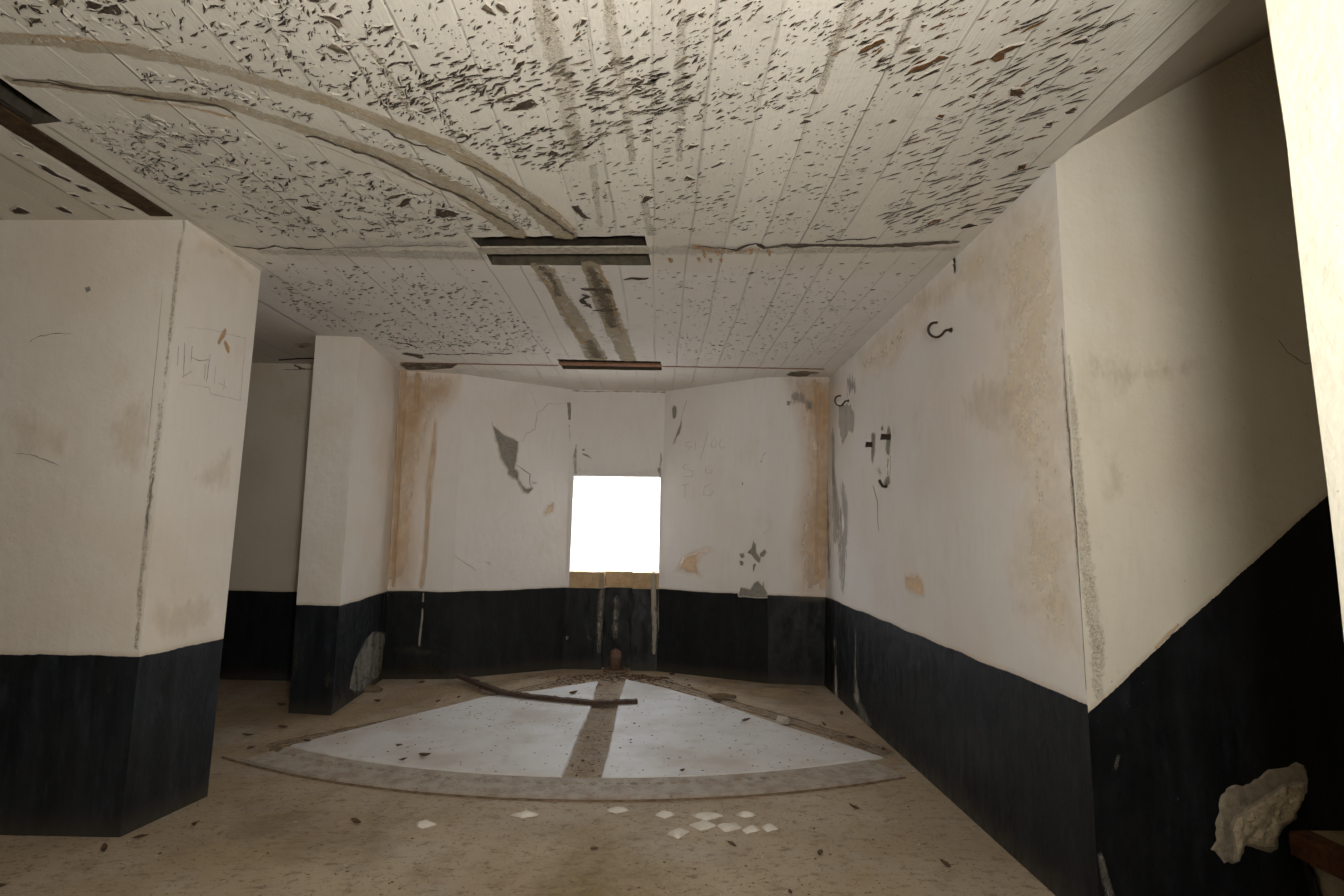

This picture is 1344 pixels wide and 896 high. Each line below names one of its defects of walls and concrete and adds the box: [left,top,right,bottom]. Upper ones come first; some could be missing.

peeling [1,0,1135,240]
peeling [267,262,550,359]
peeling [561,272,624,354]
peeling [634,262,915,377]
flaking render [492,402,571,494]
peeling [134,426,161,649]
flaking render [738,540,767,598]
peeling [1063,357,1100,683]
flaking render [1211,762,1308,864]